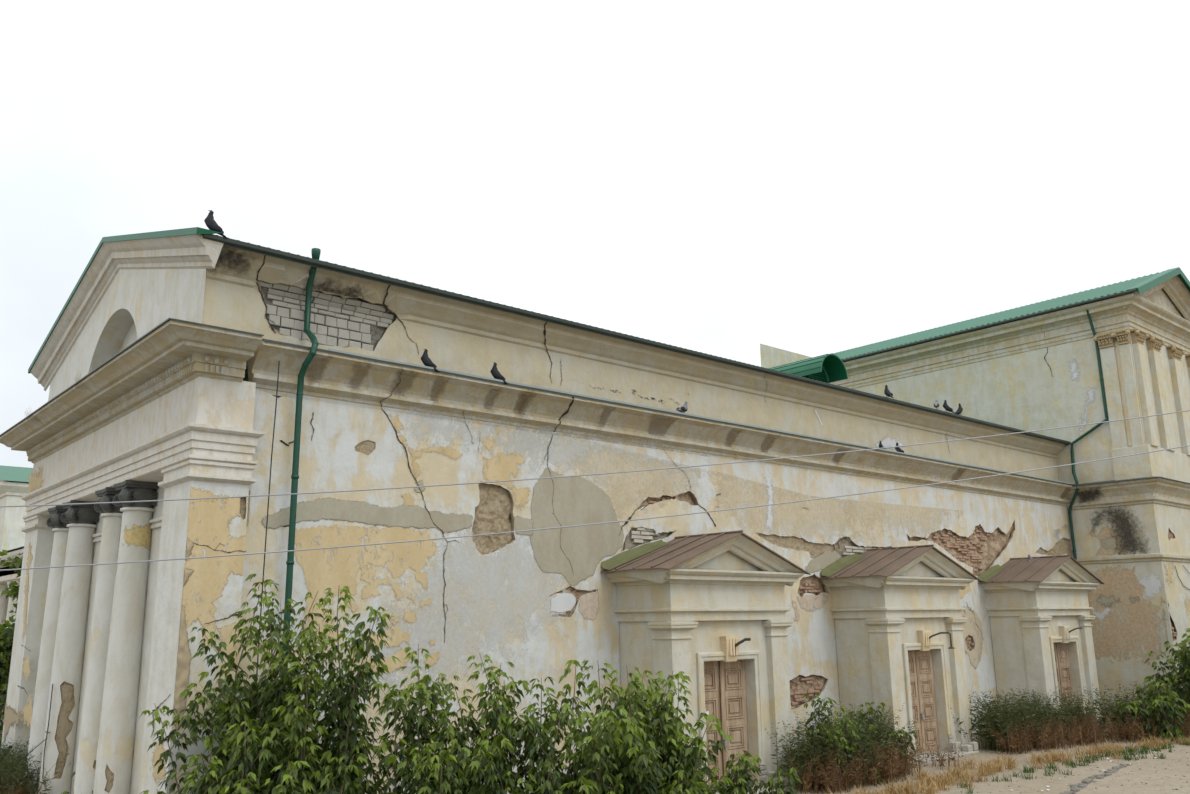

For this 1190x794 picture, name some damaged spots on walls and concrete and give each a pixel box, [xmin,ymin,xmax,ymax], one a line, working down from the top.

spalling [256,280,397,351]
peeling [174,487,250,730]
crack [380,285,460,643]
spalling [471,426,531,555]
crack [543,322,575,575]
spalling [550,586,598,617]
spalling [623,527,675,551]
spalling [637,491,699,511]
spalling [756,533,892,559]
spalling [907,519,1015,669]
damp [1077,487,1146,555]
spalling [54,681,75,779]